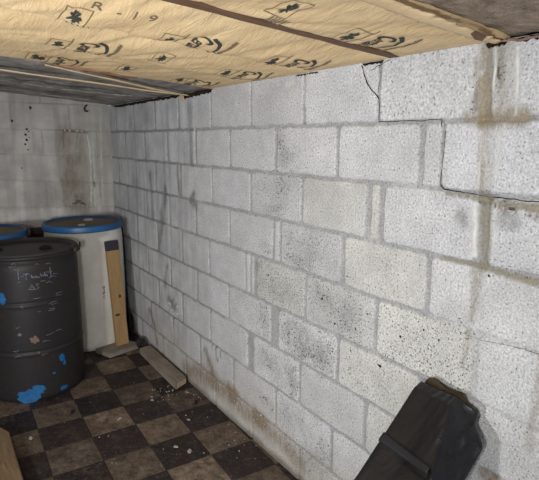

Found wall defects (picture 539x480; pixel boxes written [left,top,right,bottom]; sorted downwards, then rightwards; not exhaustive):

crack [361,59,391,99]
damp [473,42,529,189]
crack [379,119,539,202]